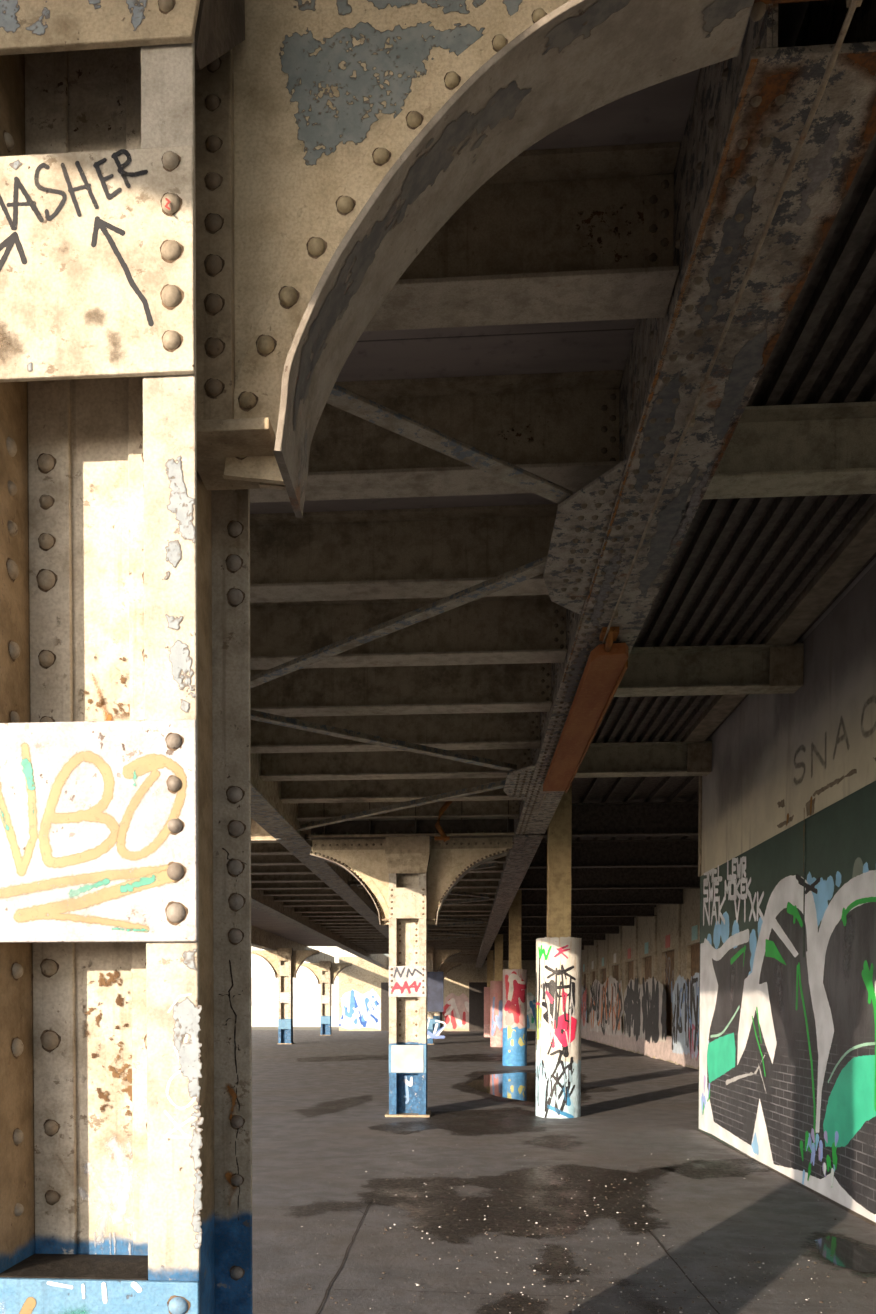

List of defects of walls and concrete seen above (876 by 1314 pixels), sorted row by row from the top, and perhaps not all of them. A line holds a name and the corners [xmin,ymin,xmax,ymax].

peeling [279,0,486,166]
corrosion [713,68,799,222]
corrosion [757,51,876,378]
peeling [162,455,196,580]
peeling [165,614,197,713]
corrosion [84,964,132,1116]
peeling [172,997,204,1249]
crack [218,925,245,1221]
damp [291,1054,771,1285]
crack [316,1190,509,1314]
damp [476,1292,546,1314]
damp [801,1232,876,1279]